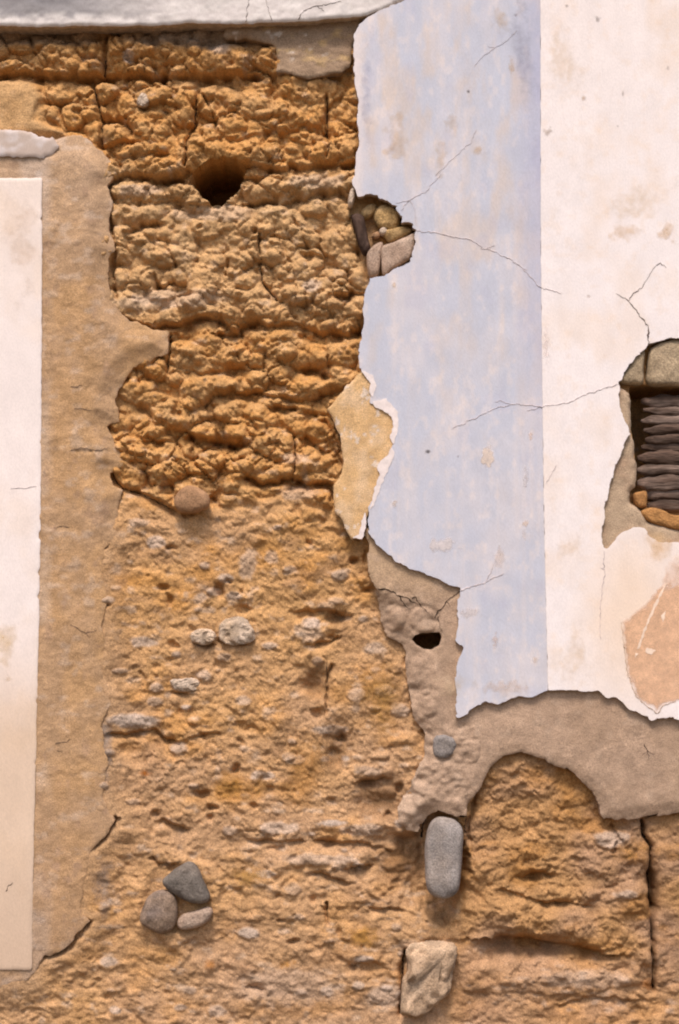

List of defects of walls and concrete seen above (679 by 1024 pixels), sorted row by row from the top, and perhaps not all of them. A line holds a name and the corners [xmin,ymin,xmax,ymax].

crack [403,131,560,294]
crack [619,263,665,345]
spalling [0,29,425,841]
crack [452,384,617,429]
spalling [629,383,679,494]
peeling [625,583,679,708]
crack [640,815,656,988]